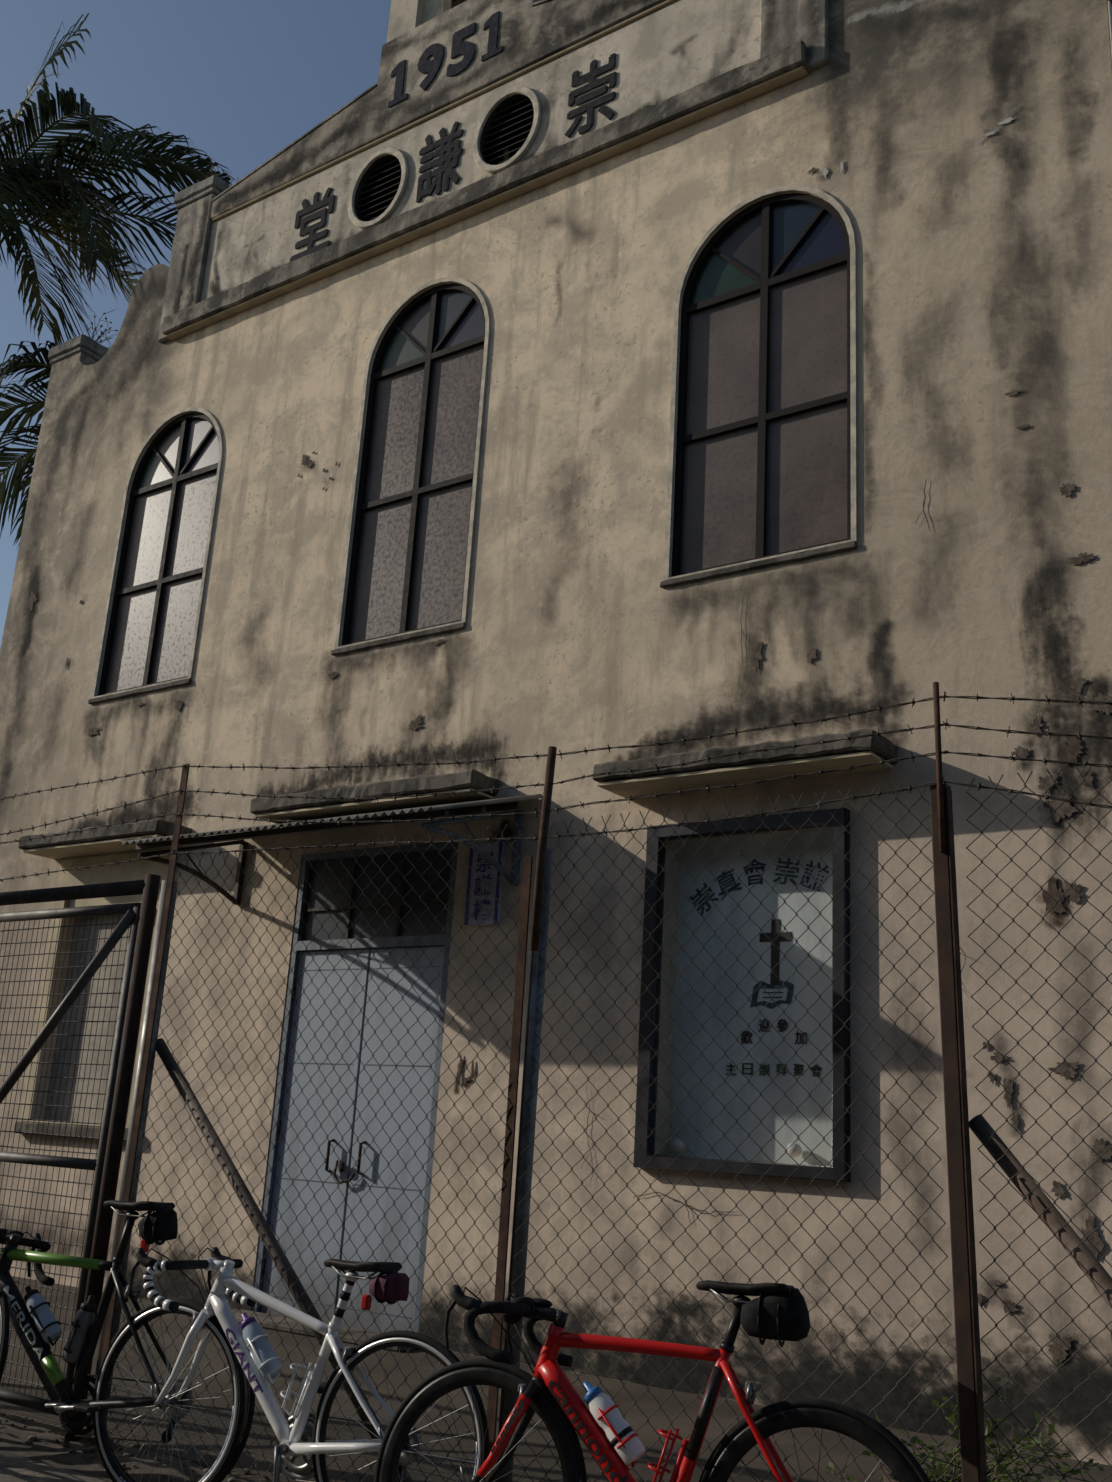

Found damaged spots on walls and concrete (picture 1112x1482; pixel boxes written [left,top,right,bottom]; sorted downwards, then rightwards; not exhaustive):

leakage [999,217,1054,430]
leakage [1025,461,1094,594]
leakage [19,544,38,674]
leakage [68,693,192,830]
leakage [260,634,504,797]
leakage [617,564,903,761]
leakage [418,1288,960,1438]
leakage [981,1334,1112,1455]